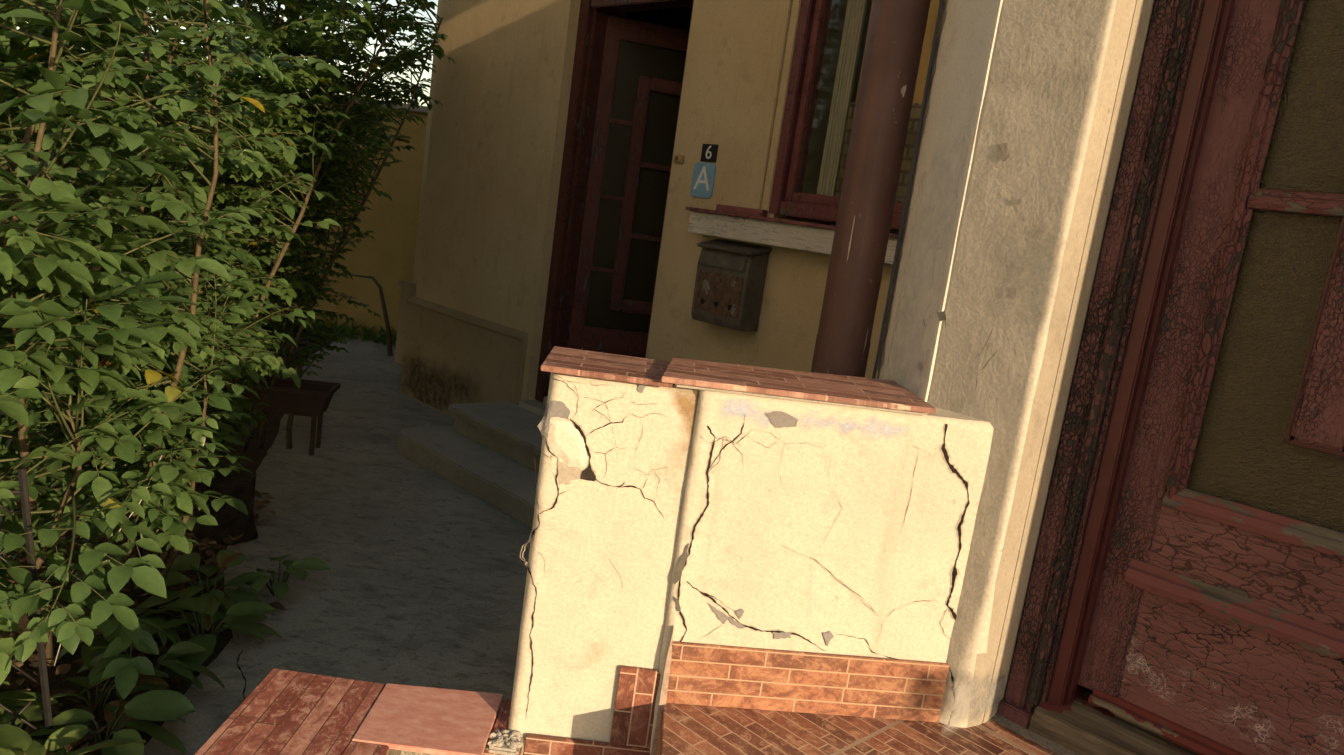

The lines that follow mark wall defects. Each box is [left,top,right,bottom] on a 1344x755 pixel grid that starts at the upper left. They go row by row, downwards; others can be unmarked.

flaking render [537,400,596,485]
crack [520,375,970,724]